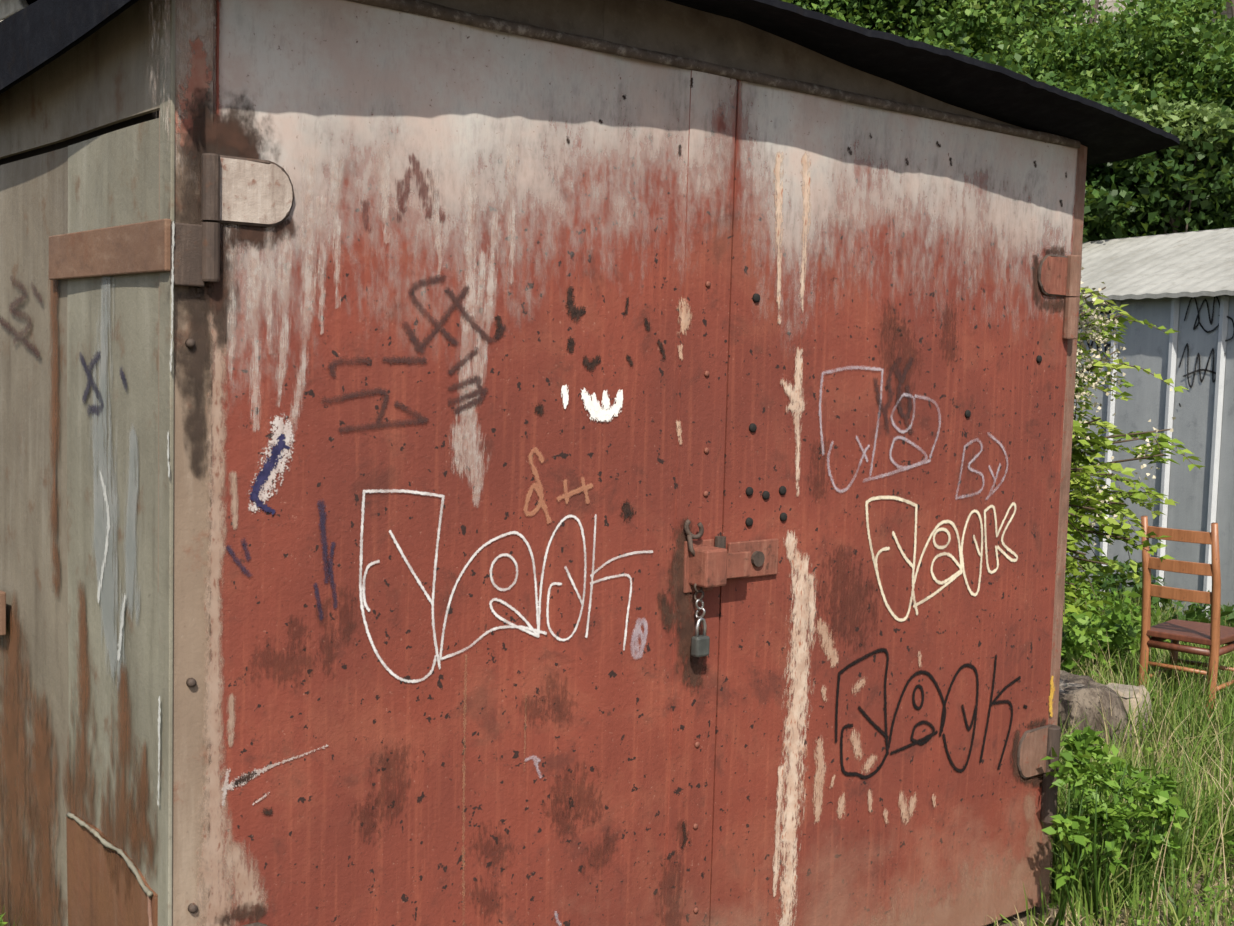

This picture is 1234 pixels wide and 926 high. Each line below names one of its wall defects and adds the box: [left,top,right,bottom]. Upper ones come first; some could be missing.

rust [194,112,258,159]
rust [206,220,295,311]
peeling [780,347,804,497]
peeling [773,531,845,926]
peeling [850,729,877,773]
peeling [868,789,916,825]